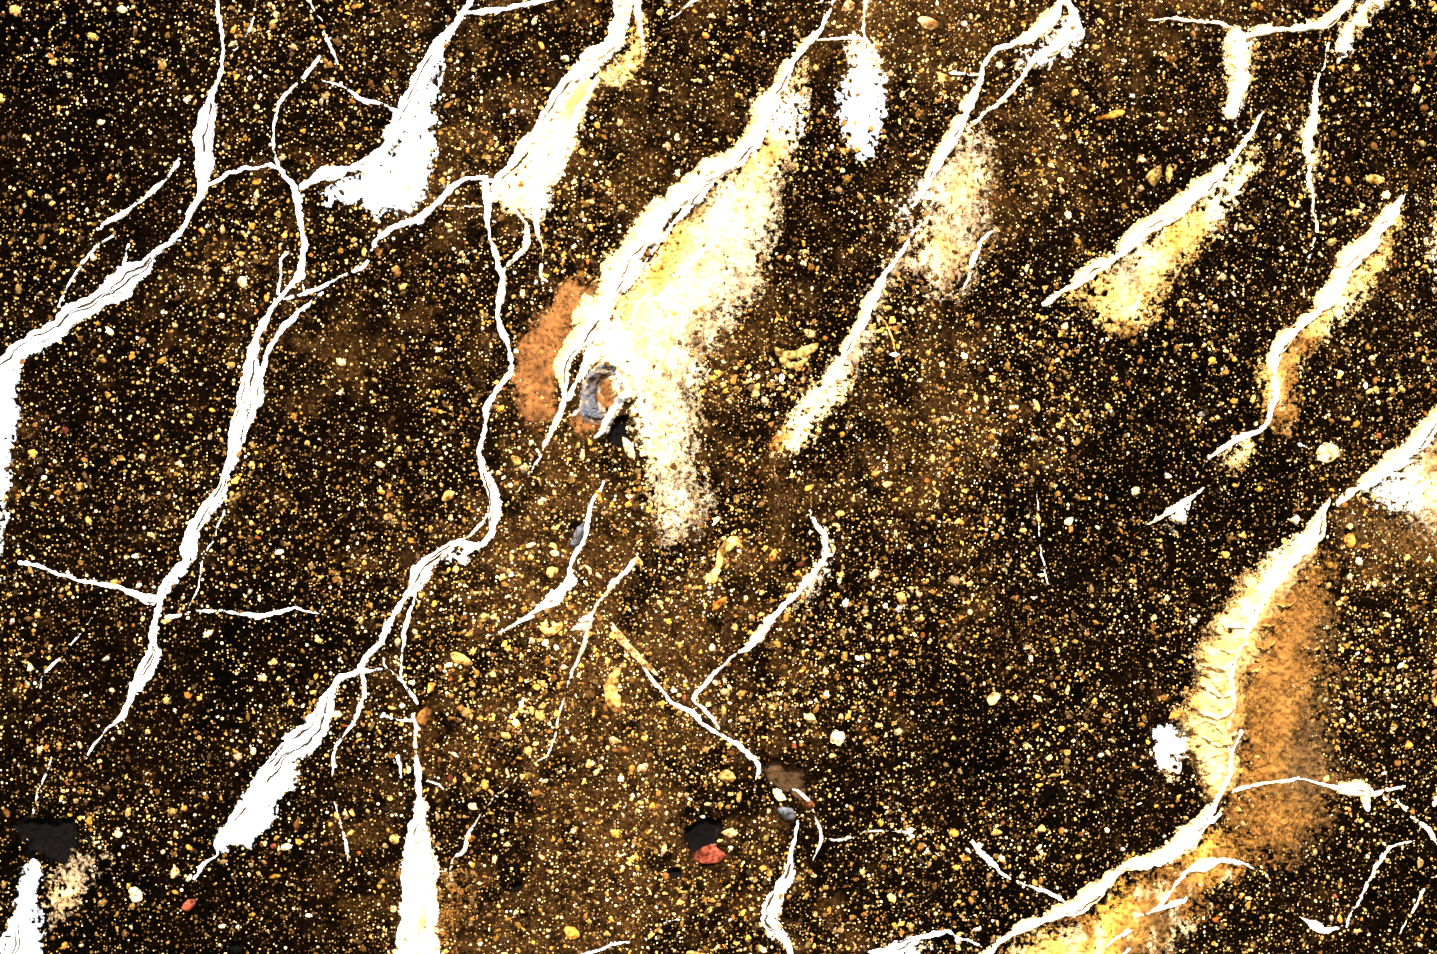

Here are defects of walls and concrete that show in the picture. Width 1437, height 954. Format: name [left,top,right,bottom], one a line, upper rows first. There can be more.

leakage [0,374,20,553]
leakage [0,849,113,954]
leakage [215,697,328,852]
leakage [321,58,444,222]
crack [0,0,868,954]
leakage [580,56,812,553]
crack [761,789,940,954]
leakage [835,0,888,161]
crack [789,0,1083,449]
crack [868,404,1437,954]
leakage [1000,432,1437,954]
crack [1042,0,1406,528]